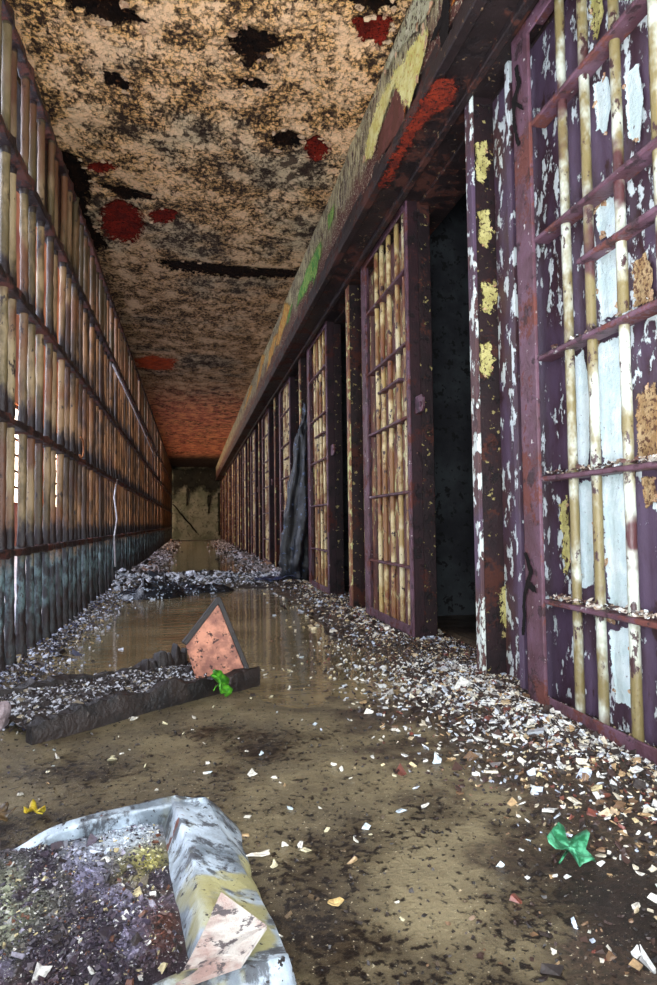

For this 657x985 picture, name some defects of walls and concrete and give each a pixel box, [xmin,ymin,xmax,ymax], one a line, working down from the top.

spalling [50,0,148,35]
spalling [99,71,134,94]
spalling [224,23,284,91]
peeling [350,0,433,163]
spalling [266,128,332,162]
flaking render [61,150,180,252]
peeling [593,197,615,240]
peeling [480,280,499,315]
peeling [596,248,618,321]
peeling [630,252,654,307]
peeling [479,341,495,378]
peeling [558,336,631,708]